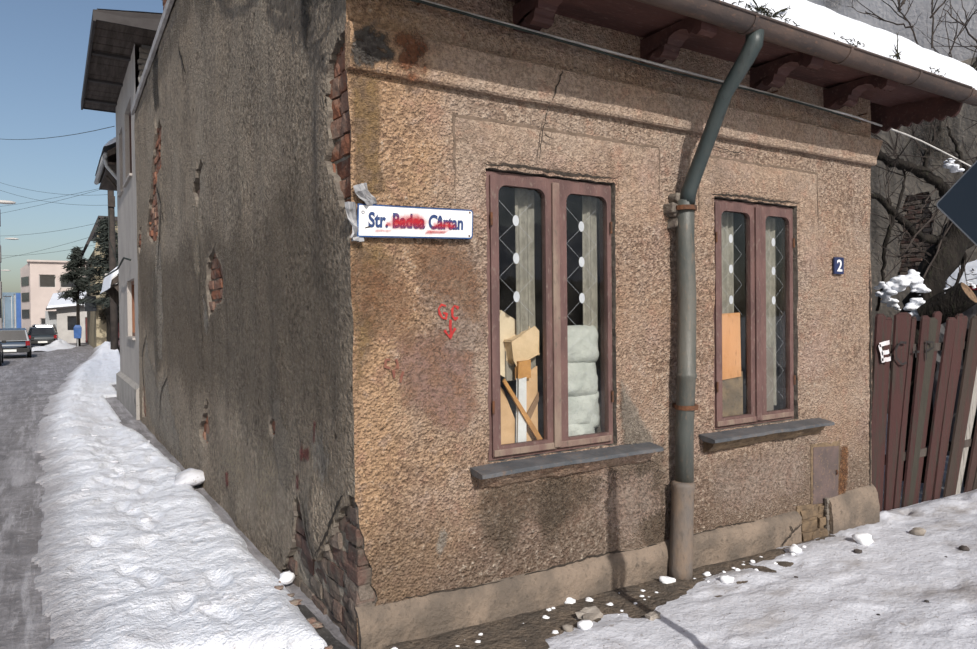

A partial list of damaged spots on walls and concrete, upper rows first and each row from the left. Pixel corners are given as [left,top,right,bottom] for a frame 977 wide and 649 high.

flaking render [324,30,384,207]
crack [485,70,617,179]
flaking render [138,115,162,254]
flaking render [193,159,203,206]
flaking render [206,246,223,317]
crack [135,335,168,418]
flaking render [282,495,378,647]